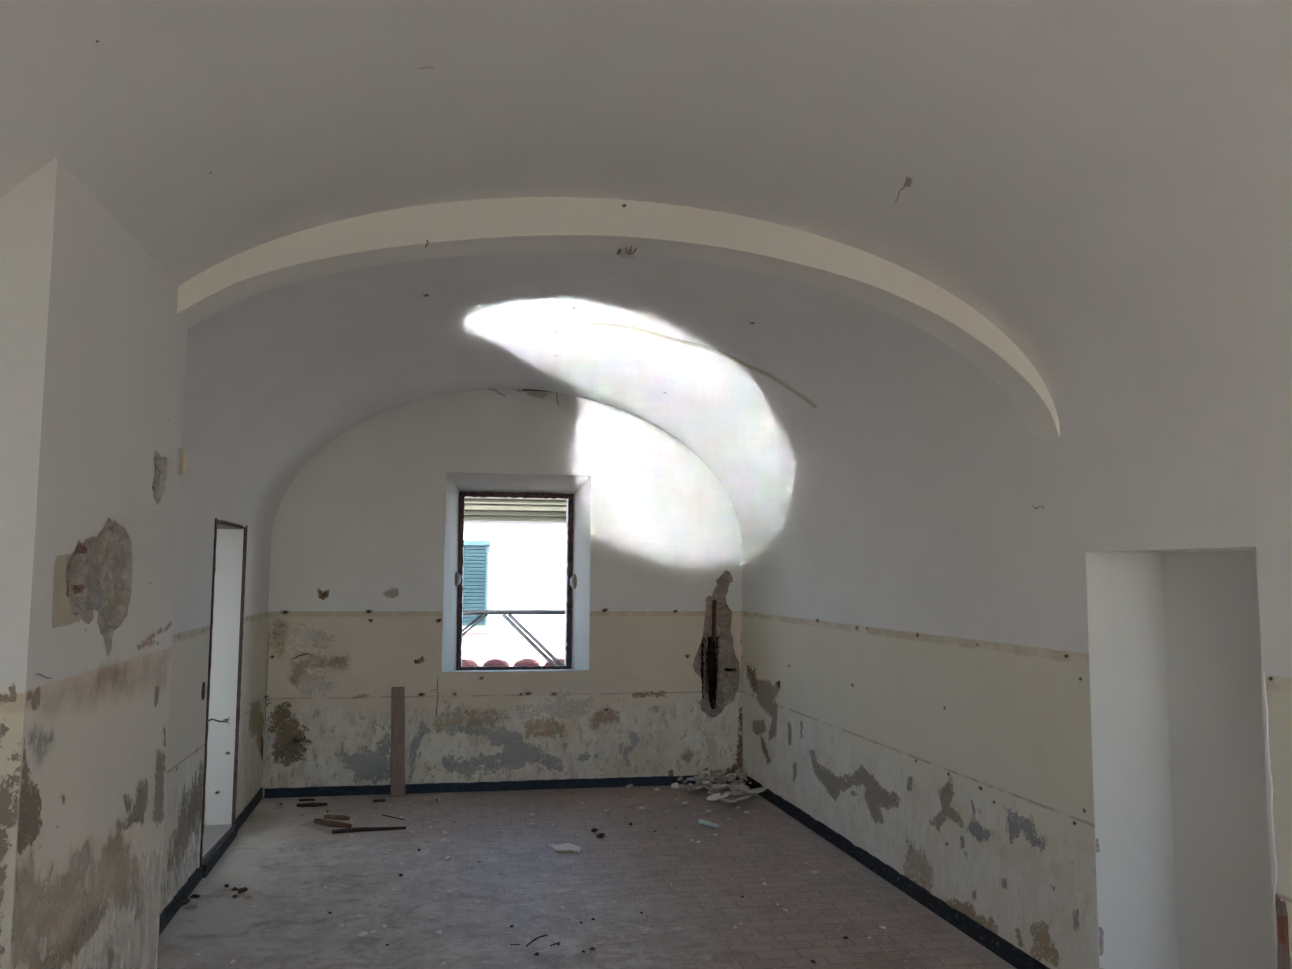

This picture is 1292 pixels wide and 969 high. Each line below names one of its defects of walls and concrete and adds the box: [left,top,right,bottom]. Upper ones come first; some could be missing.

flaking render [152,450,167,506]
flaking render [66,518,133,657]
peeling [0,683,43,967]
peeling [753,679,913,824]
peeling [929,775,1047,856]